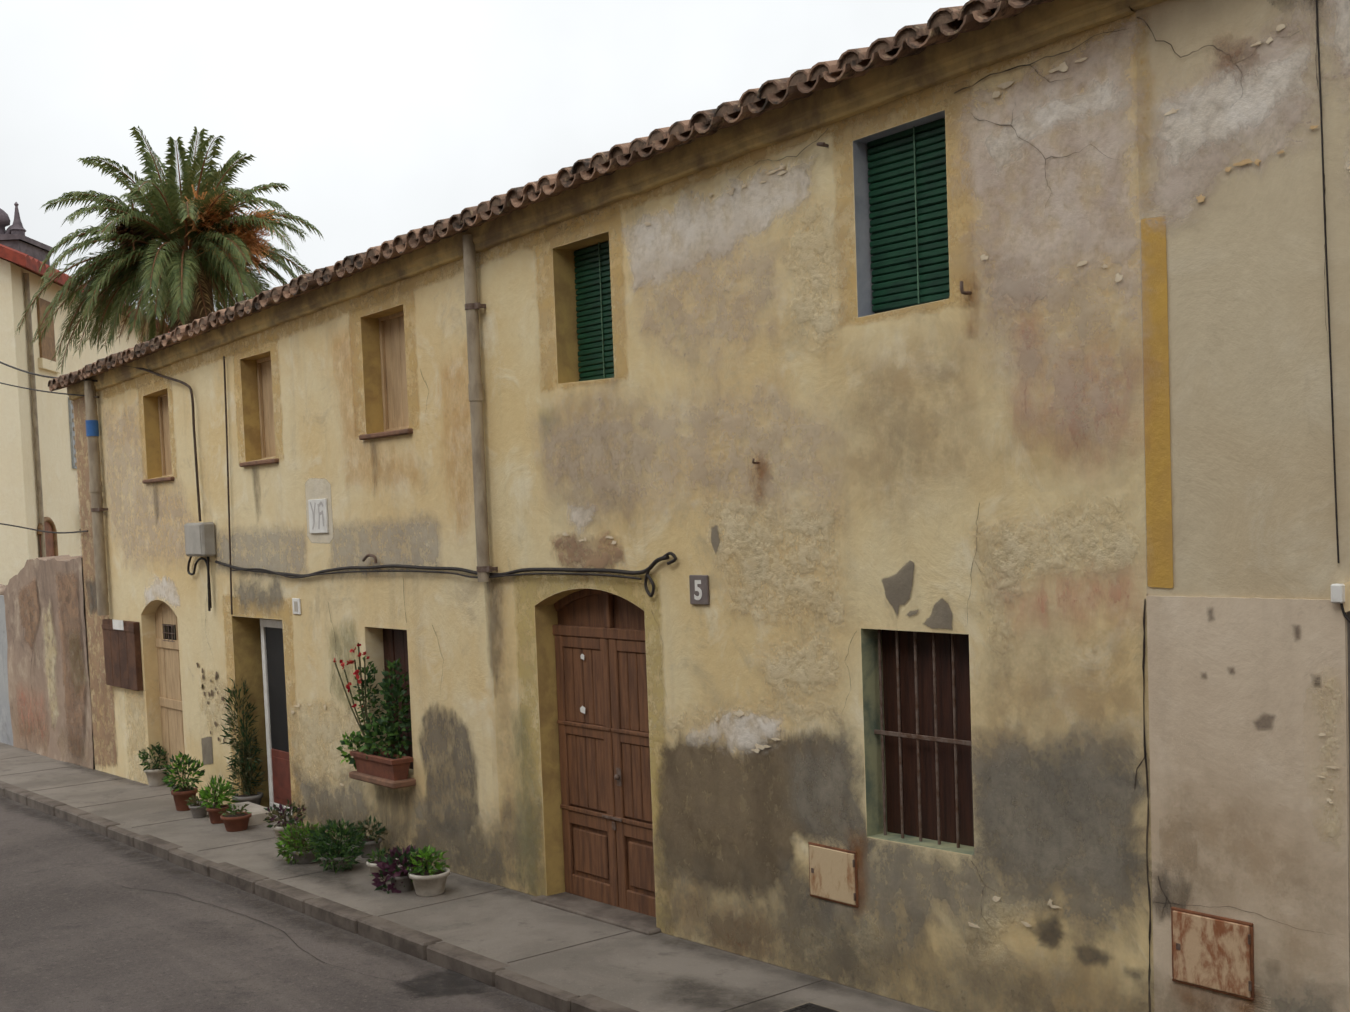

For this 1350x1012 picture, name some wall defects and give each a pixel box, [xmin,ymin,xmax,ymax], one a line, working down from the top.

peeling [627,164,810,289]
peeling [964,24,1137,311]
crack [954,17,1320,211]
peeling [1160,52,1308,164]
spalling [554,505,623,573]
spalling [882,561,952,629]
damp [296,707,537,894]
peeling [687,709,781,753]
damp [658,732,1190,1012]
crack [1134,599,1331,1012]